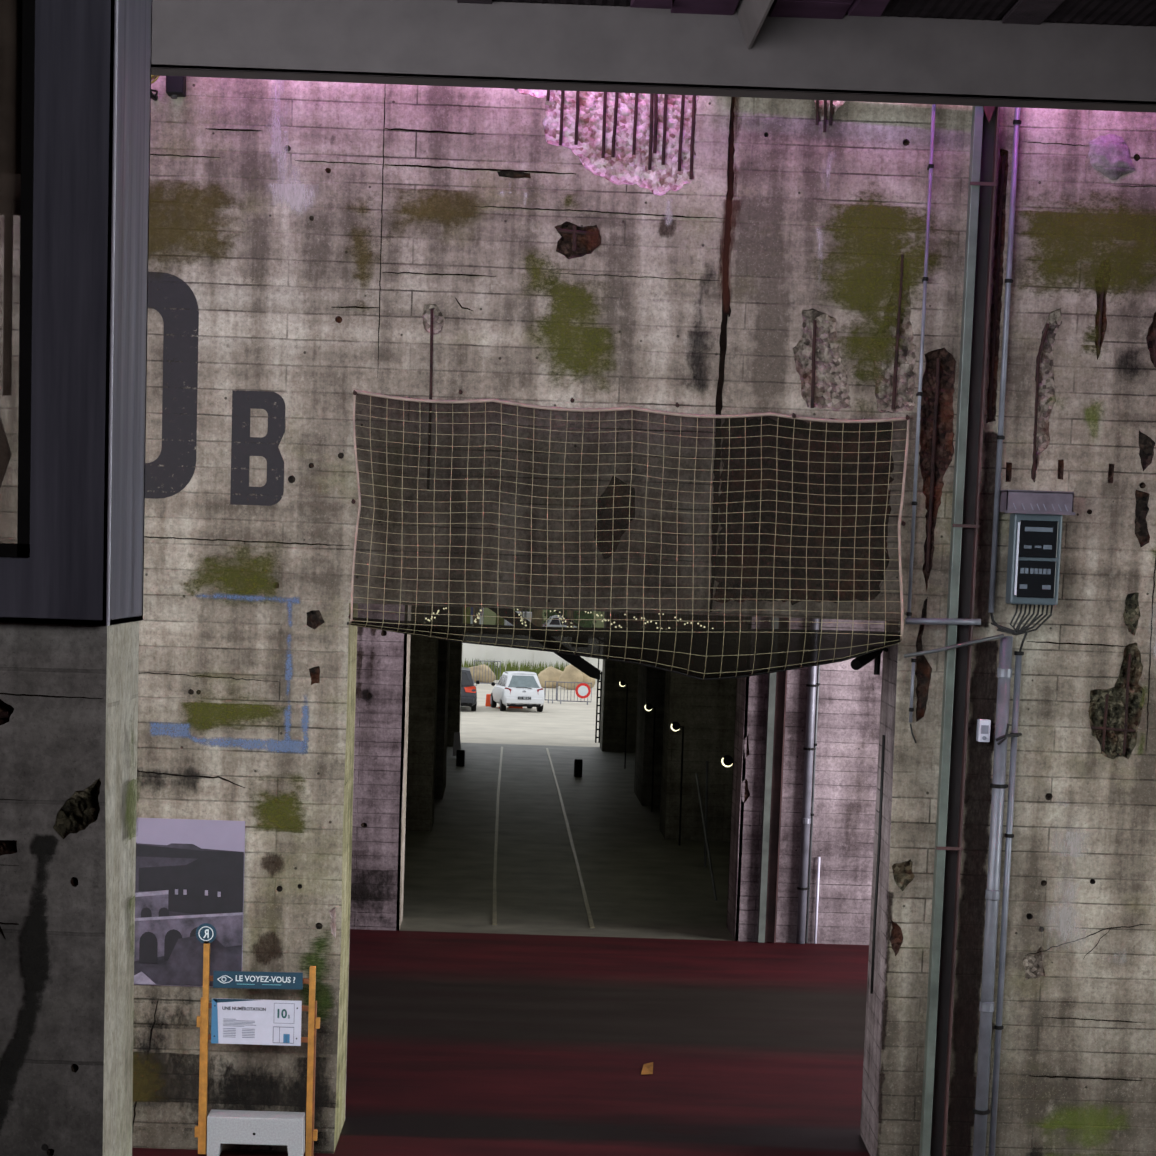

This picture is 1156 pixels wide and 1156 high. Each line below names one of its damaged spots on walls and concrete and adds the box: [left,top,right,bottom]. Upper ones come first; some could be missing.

crack [295,98,576,359]
spalling [497,171,531,179]
spalling [555,221,601,259]
crack [476,97,735,232]
spalling [514,89,699,196]
crack [551,272,731,415]
spalling [793,308,851,419]
spalling [1031,308,1062,483]
spalling [868,254,956,722]
spalling [1088,592,1145,759]